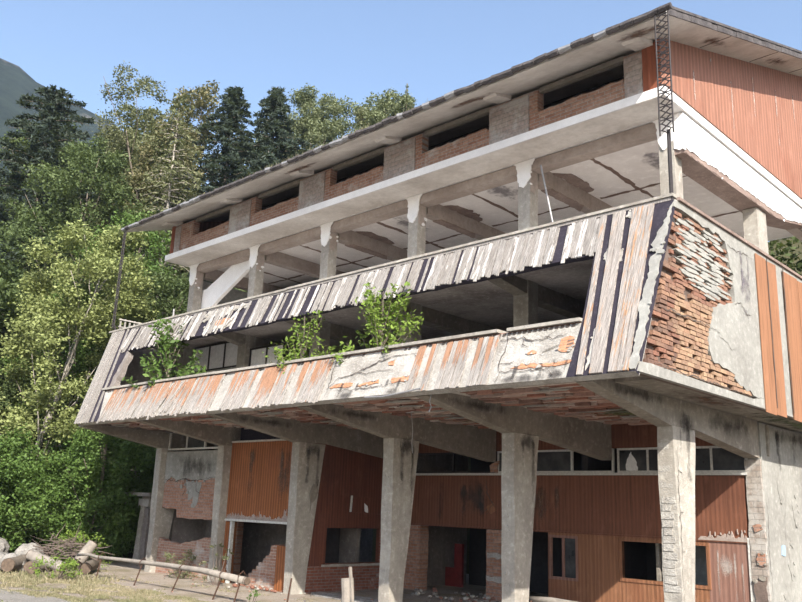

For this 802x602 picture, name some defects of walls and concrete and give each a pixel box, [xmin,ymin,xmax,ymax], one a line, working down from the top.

spalling [621,201,752,396]
crack [326,353,416,391]
crack [495,329,567,381]
spalling [460,382,653,426]
spalling [753,553,769,602]